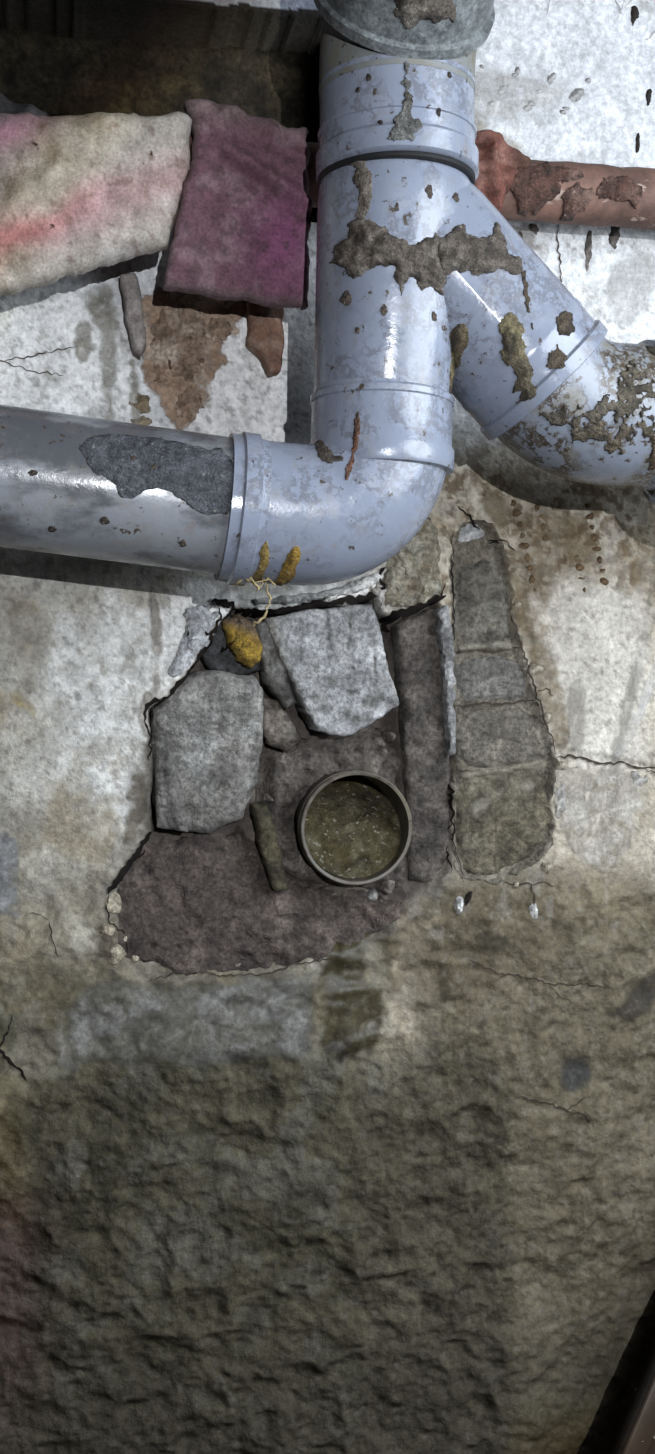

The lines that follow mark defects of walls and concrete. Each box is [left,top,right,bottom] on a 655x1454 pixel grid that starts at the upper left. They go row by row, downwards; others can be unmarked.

peeling [129,287,246,430]
spalling [447,520,567,915]
crack [511,615,655,773]
spalling [67,572,407,1067]
crack [0,1017,27,1081]
leakage [617,973,655,1018]